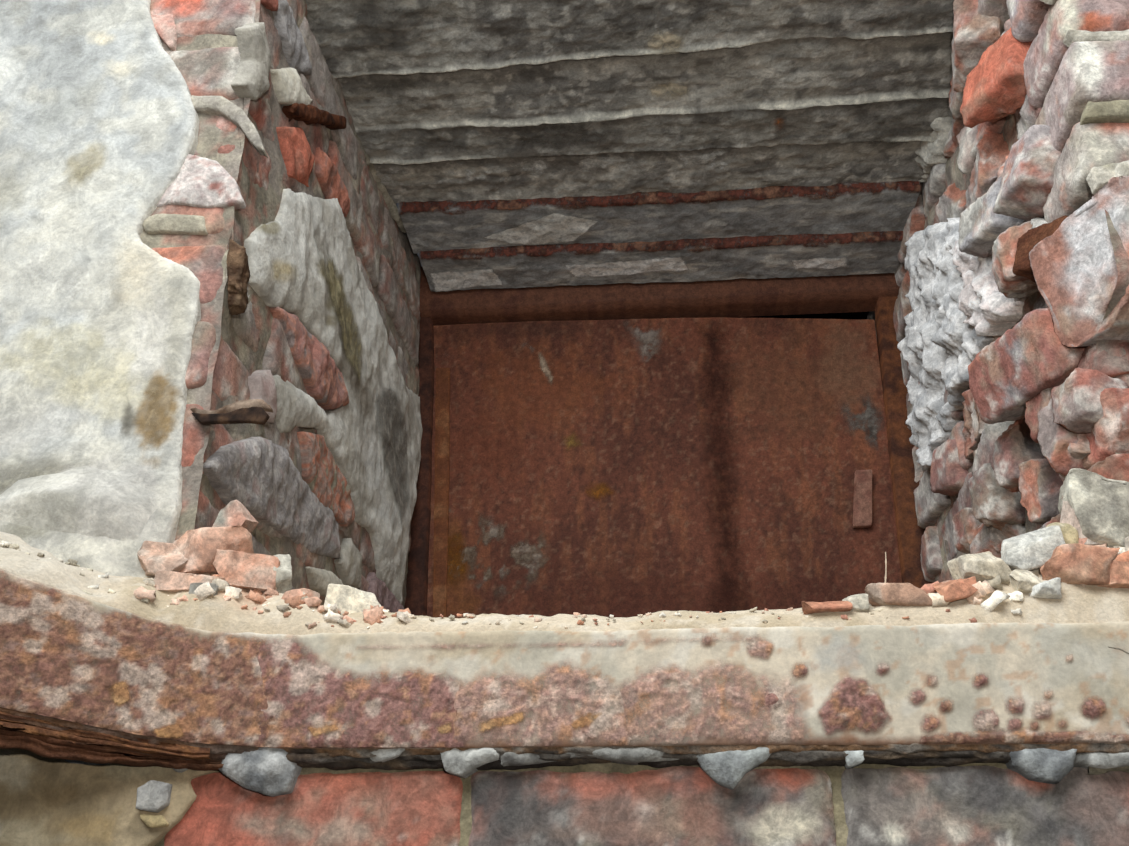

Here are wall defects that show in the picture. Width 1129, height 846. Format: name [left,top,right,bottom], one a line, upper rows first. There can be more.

flaking render [142,0,313,304]
flaking render [181,189,423,604]
rust [400,181,921,215]
rust [420,231,903,260]
spalling [893,0,1129,582]
rust [0,571,1129,775]